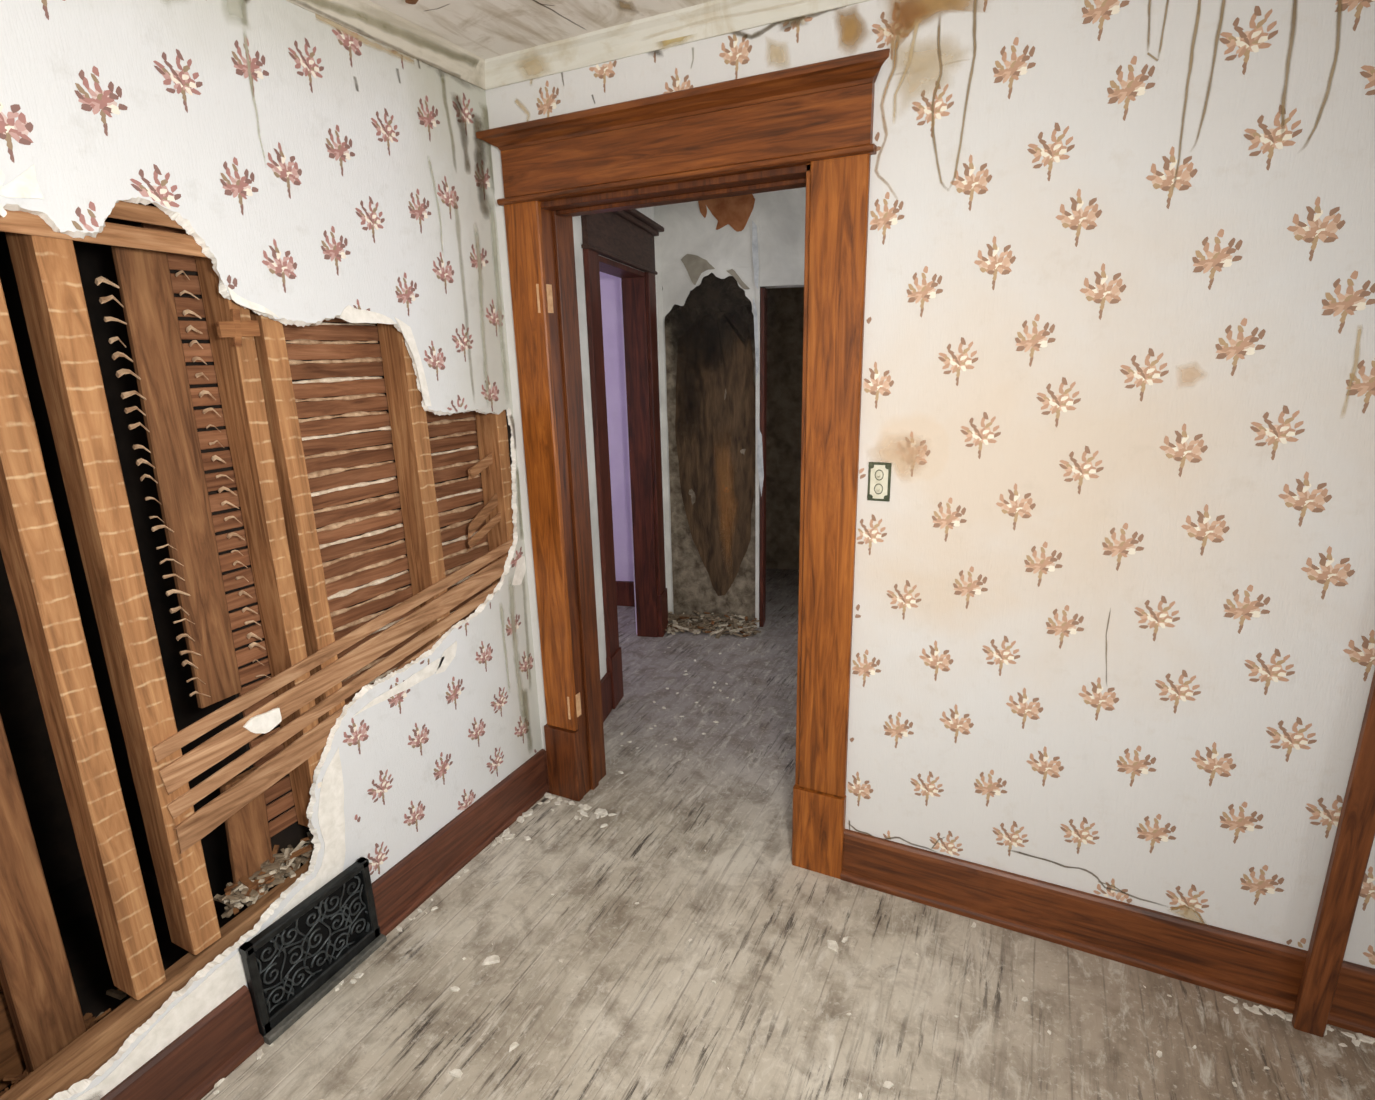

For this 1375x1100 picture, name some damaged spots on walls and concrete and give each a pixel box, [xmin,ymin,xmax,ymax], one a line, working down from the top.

water stain [733,9,863,46]
water stain [882,0,977,184]
water stain [1147,0,1169,61]
water stain [1281,0,1297,125]
water stain [1307,0,1342,142]
water stain [442,74,501,344]
spalling [73,241,279,755]
spalling [662,194,768,624]
spalling [0,231,189,1023]
spalling [189,725,280,812]
flaking render [201,747,346,928]
flaking render [74,951,247,1100]